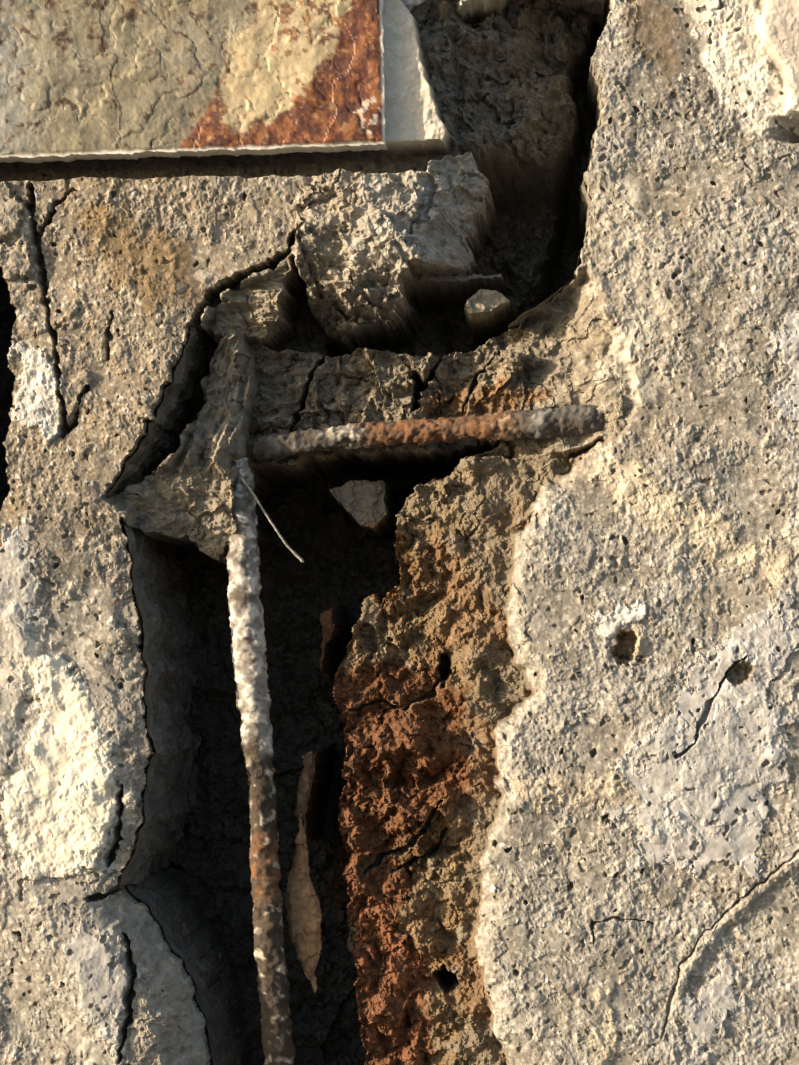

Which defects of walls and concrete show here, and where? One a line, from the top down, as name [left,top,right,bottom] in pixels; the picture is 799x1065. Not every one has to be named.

crack [23,182,92,440]
crack [105,310,115,361]
spalling [0,0,638,1065]
corrosion [371,528,410,608]
corrosion [285,663,470,1065]
crack [661,850,799,1042]